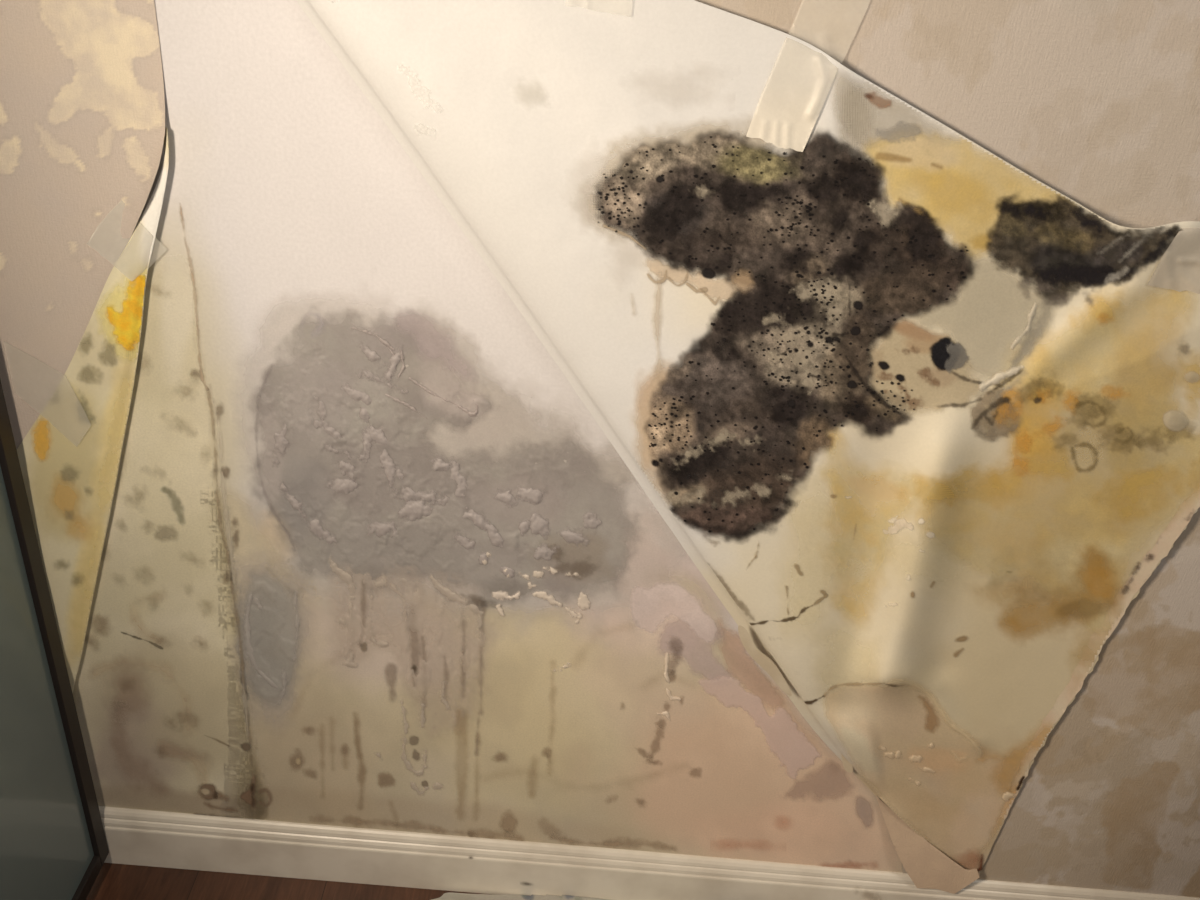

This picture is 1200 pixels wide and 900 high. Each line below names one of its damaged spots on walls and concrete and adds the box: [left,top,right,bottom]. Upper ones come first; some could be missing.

leakage [590,80,1200,632]
leakage [35,421,48,459]
leakage [73,284,903,873]
peeling [431,565,590,627]
crack [723,565,828,625]
crack [805,683,877,704]